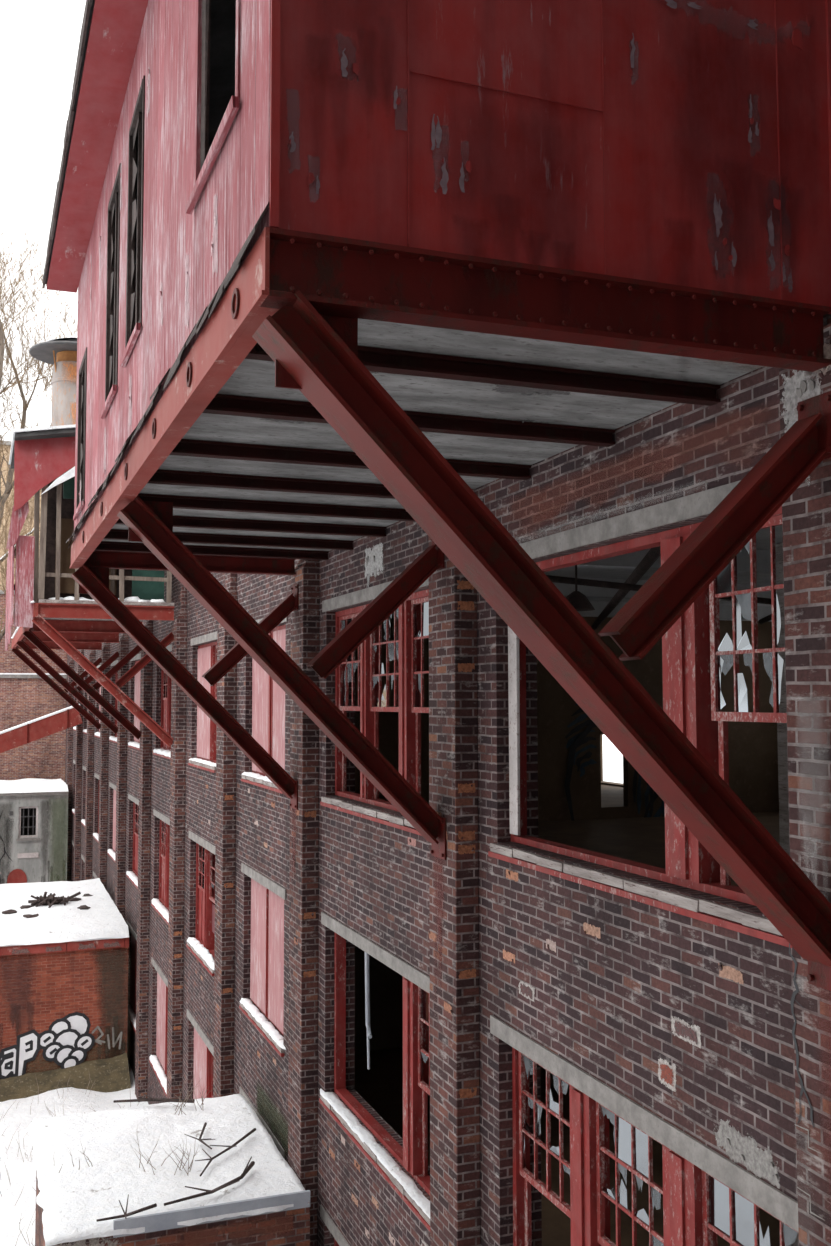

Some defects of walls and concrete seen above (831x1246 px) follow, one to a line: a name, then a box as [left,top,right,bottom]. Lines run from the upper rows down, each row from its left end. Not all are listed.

peeling [431,114,472,194]
peeling [713,193,737,270]
peeling [768,198,793,292]
leakage [97,951,127,1059]
spalling [54,1237,122,1246]